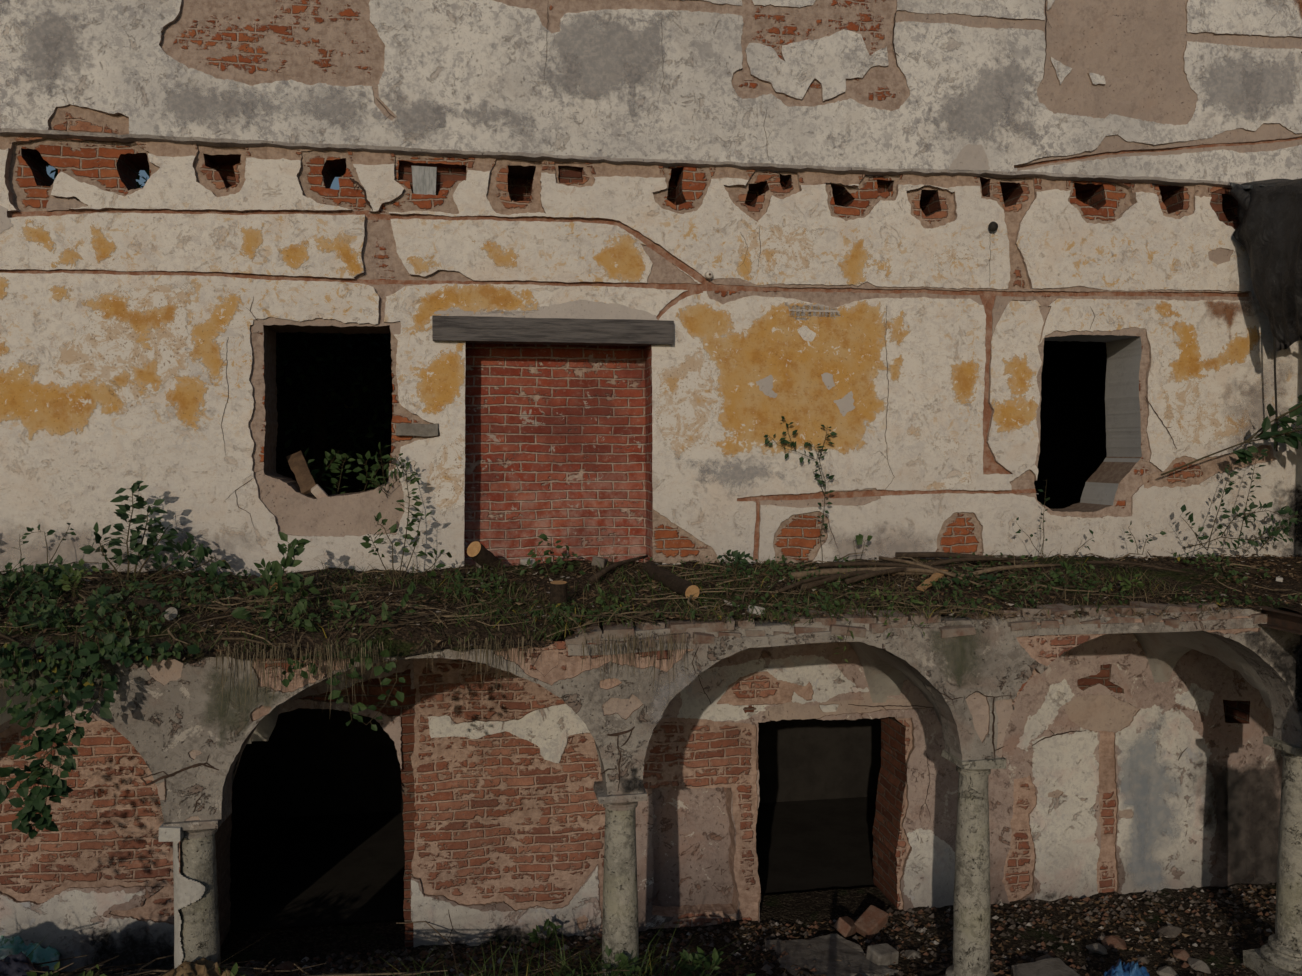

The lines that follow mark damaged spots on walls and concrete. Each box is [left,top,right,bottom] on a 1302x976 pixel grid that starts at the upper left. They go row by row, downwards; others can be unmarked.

flaking render [159,0,396,121]
damp [548,13,669,116]
flaking render [494,0,1302,125]
flaking render [0,104,1302,564]
flaking render [146,658,184,686]
flaking render [966,619,1142,758]
flaking render [0,720,180,924]
flaking render [250,639,697,947]
flaking render [1002,775,1064,902]
flaking render [1065,664,1140,893]